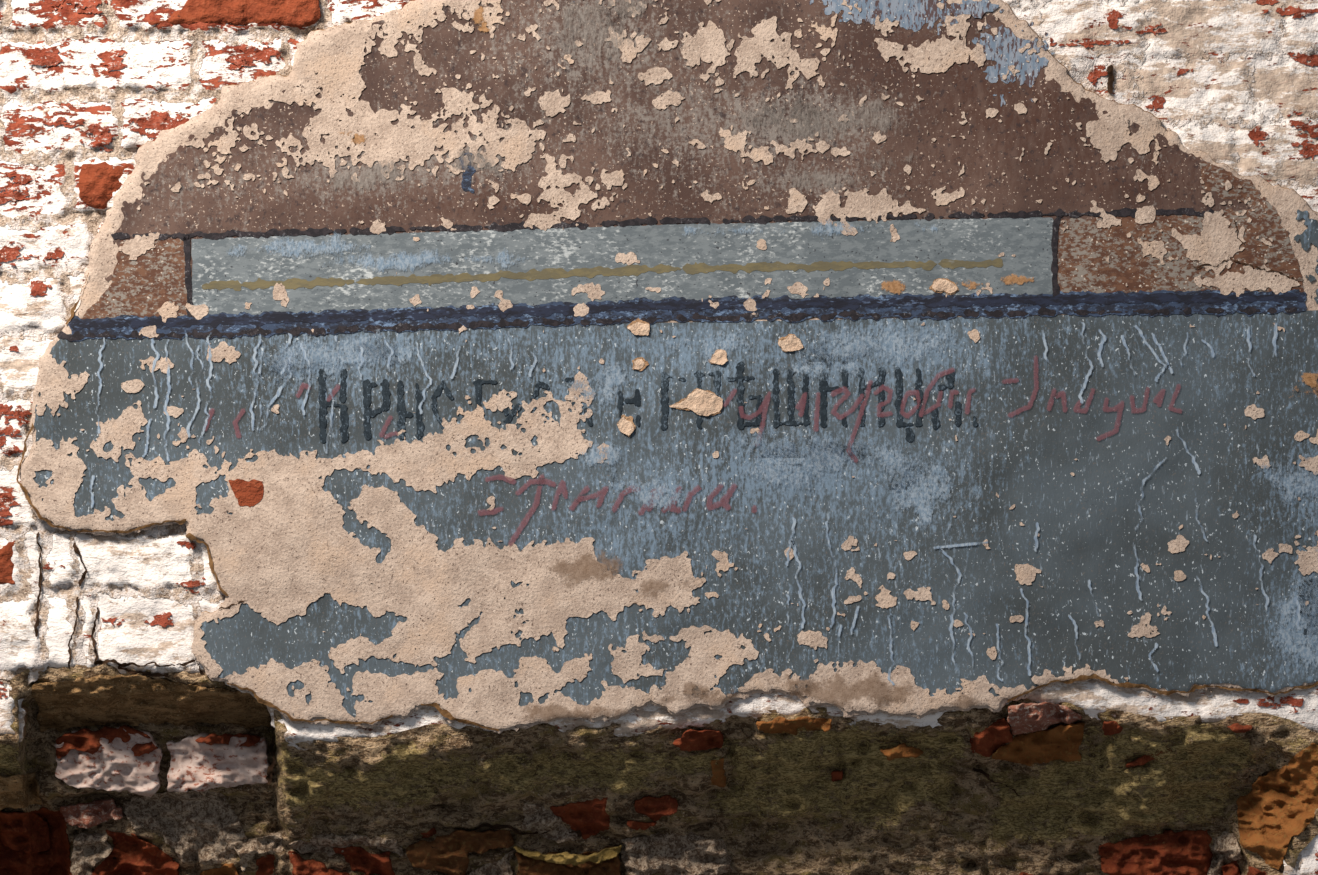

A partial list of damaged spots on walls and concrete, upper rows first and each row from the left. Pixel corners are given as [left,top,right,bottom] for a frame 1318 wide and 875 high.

peeling [838,0,1170,122]
peeling [0,168,33,205]
peeling [0,241,69,266]
peeling [28,278,52,296]
spalling [42,104,190,209]
peeling [118,232,160,260]
peeling [139,301,209,338]
peeling [169,0,861,231]
peeling [786,162,986,242]
peeling [986,91,1311,297]
crack [16,423,499,785]
spalling [0,354,1318,875]